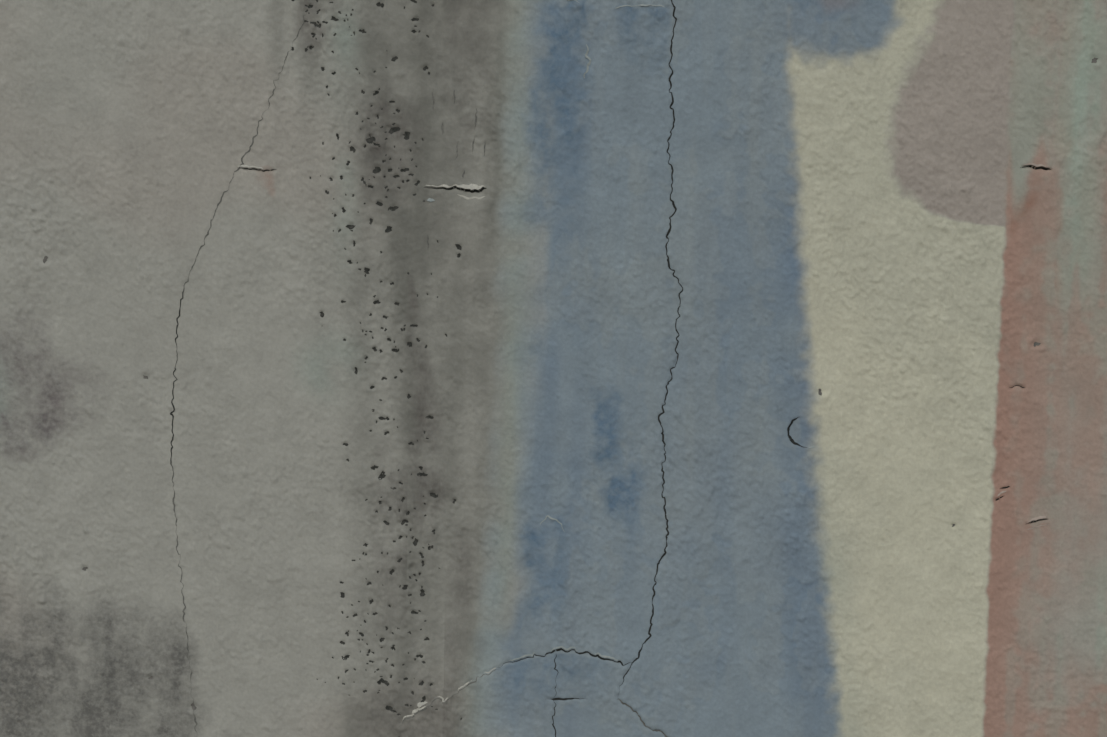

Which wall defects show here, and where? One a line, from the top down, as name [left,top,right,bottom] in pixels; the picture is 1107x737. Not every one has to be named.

leakage [291,0,351,69]
hole [291,0,366,52]
flaking render [310,88,487,224]
leakage [348,0,501,221]
flaking render [333,225,370,277]
crack [170,13,307,731]
flaking render [354,295,427,374]
crack [392,0,683,737]
leakage [342,272,490,737]